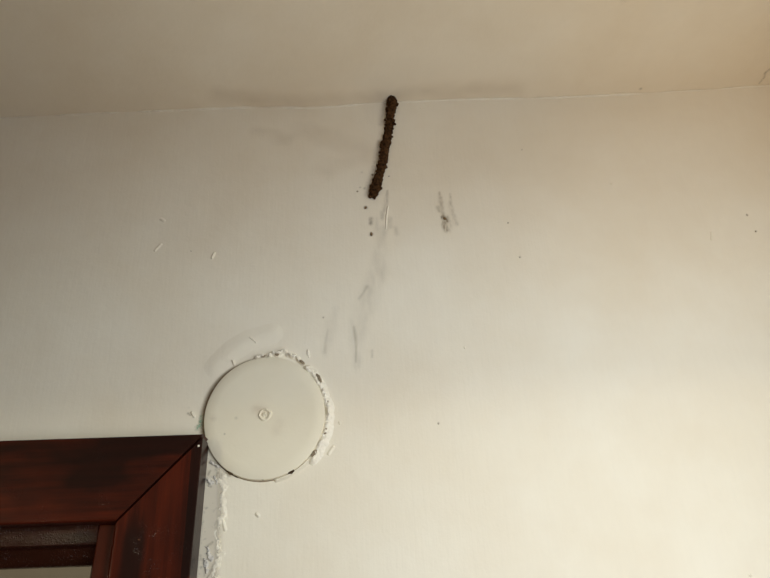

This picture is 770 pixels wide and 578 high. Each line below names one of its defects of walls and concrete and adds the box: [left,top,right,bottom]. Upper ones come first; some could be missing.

flaking render [197,449,230,578]